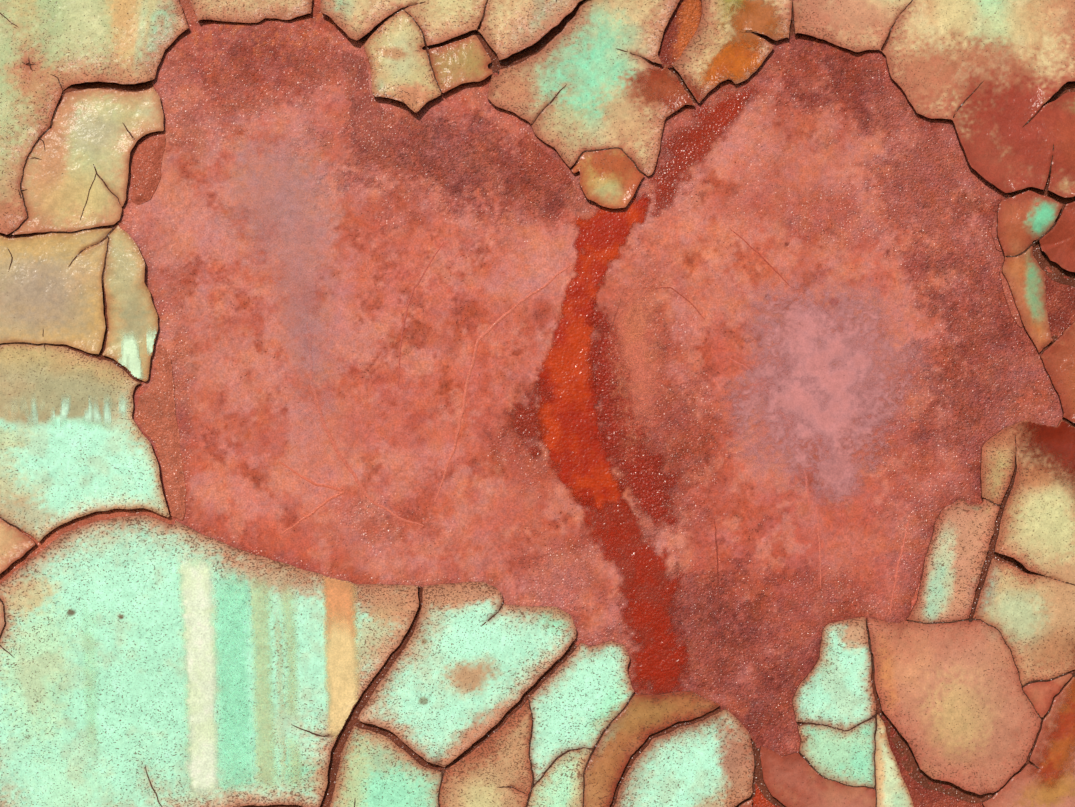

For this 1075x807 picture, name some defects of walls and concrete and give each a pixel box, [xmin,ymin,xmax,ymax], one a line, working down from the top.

crack [360,0,586,92]
crack [1023,81,1075,127]
crack [0,58,154,383]
crack [1005,144,1075,288]
peeling [0,0,720,807]
rust [509,0,784,693]
peeling [428,0,1075,807]
crack [0,508,173,657]
rust [325,578,359,736]
crack [242,586,721,807]
crack [735,740,786,807]
crack [797,436,1075,807]